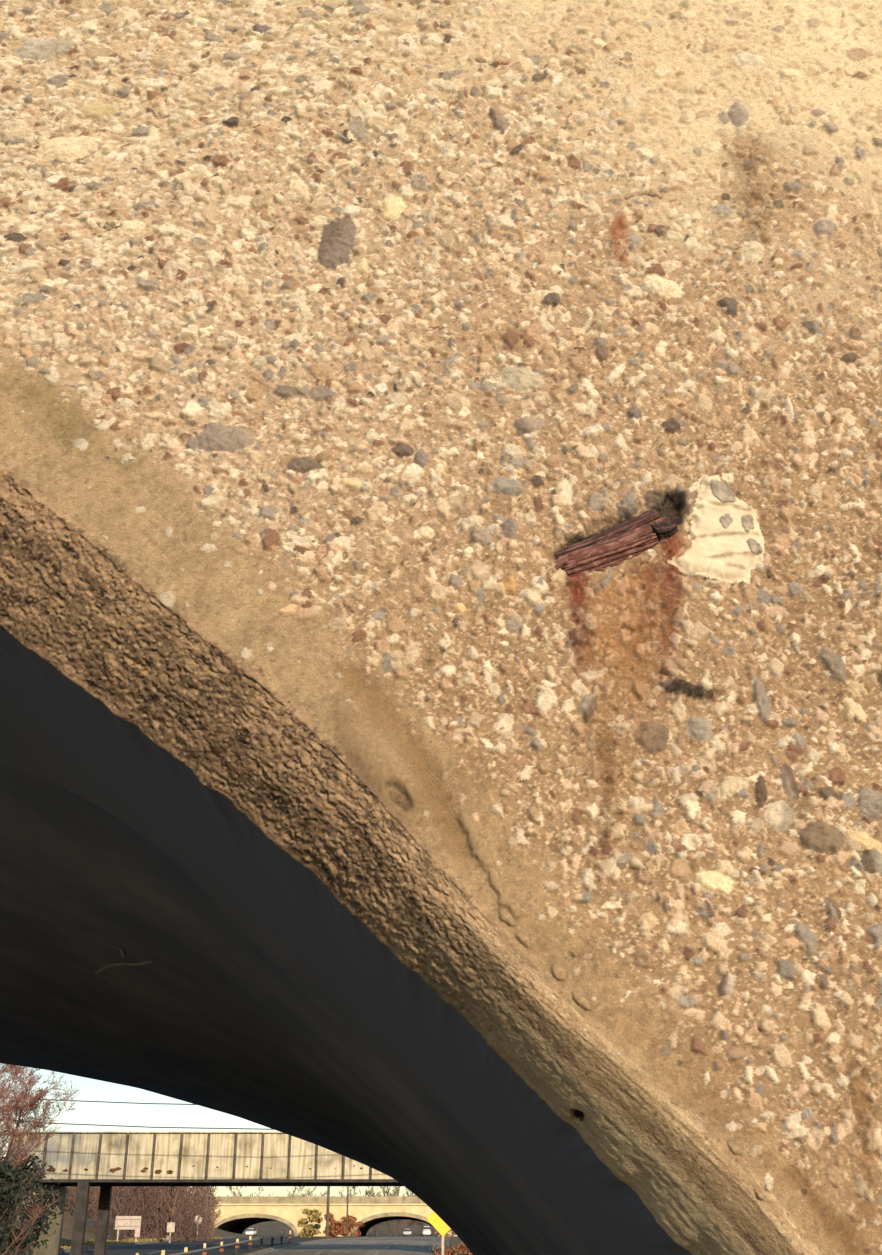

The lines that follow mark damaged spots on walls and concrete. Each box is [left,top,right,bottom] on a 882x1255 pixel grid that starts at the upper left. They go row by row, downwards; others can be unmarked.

spalling [553,491,686,577]